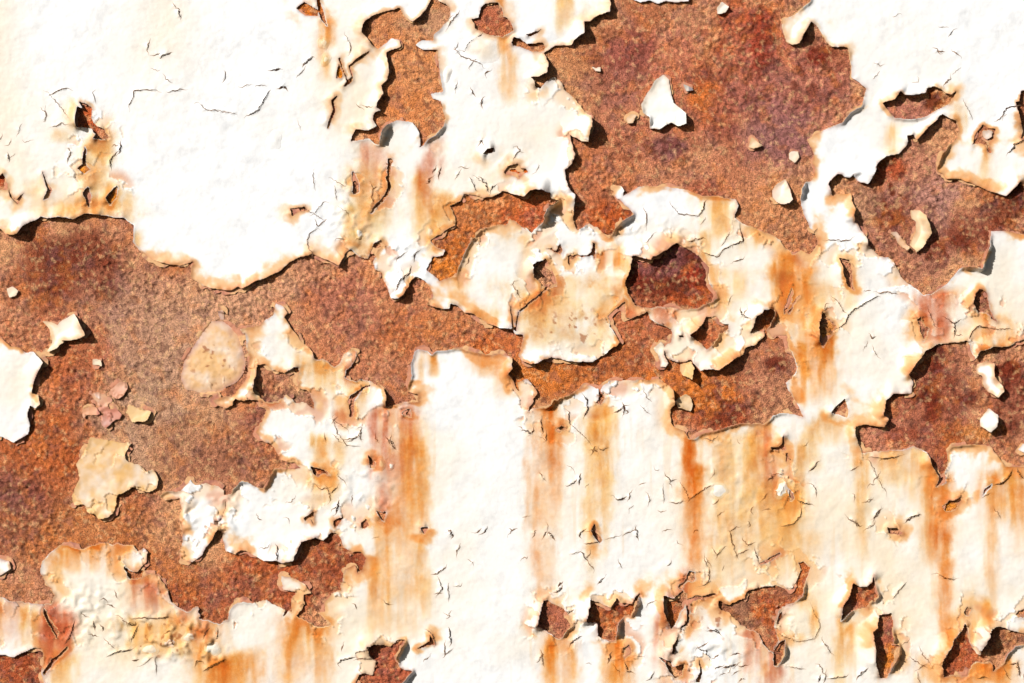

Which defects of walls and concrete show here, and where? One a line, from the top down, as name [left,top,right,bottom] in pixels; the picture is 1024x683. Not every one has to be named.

crack [128,38,313,117]
crack [88,141,122,206]
peeling [472,0,866,254]
peeling [0,191,803,629]
crack [518,391,652,487]
peeling [857,341,1024,485]
crack [847,455,920,535]
crack [420,437,819,682]
crack [44,592,172,674]
peeling [718,562,810,665]
peeling [873,613,898,678]
peeling [942,625,1024,677]